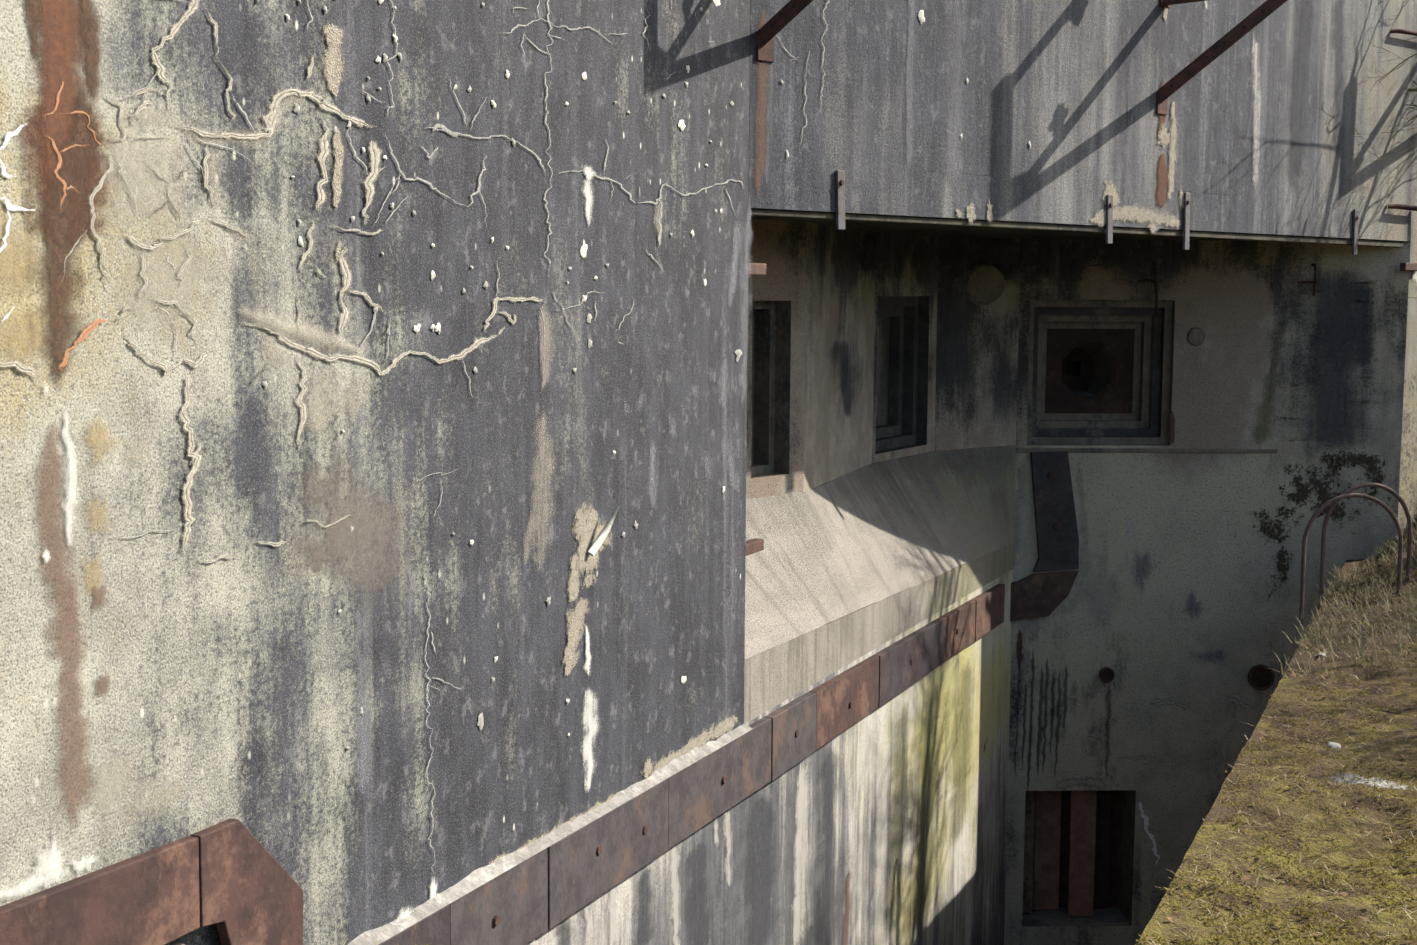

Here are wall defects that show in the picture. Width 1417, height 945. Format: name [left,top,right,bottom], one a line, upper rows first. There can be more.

corrosion [20,0,107,379]
corrosion [756,61,767,190]
corrosion [1156,154,1168,207]
damp [1252,40,1261,185]
damp [1333,0,1344,149]
crack [0,0,743,566]
damp [832,342,855,415]
damp [1306,272,1373,447]
corrosion [39,431,108,816]
spalling [563,502,612,676]
damp [1014,648,1068,789]
damp [914,700,938,924]